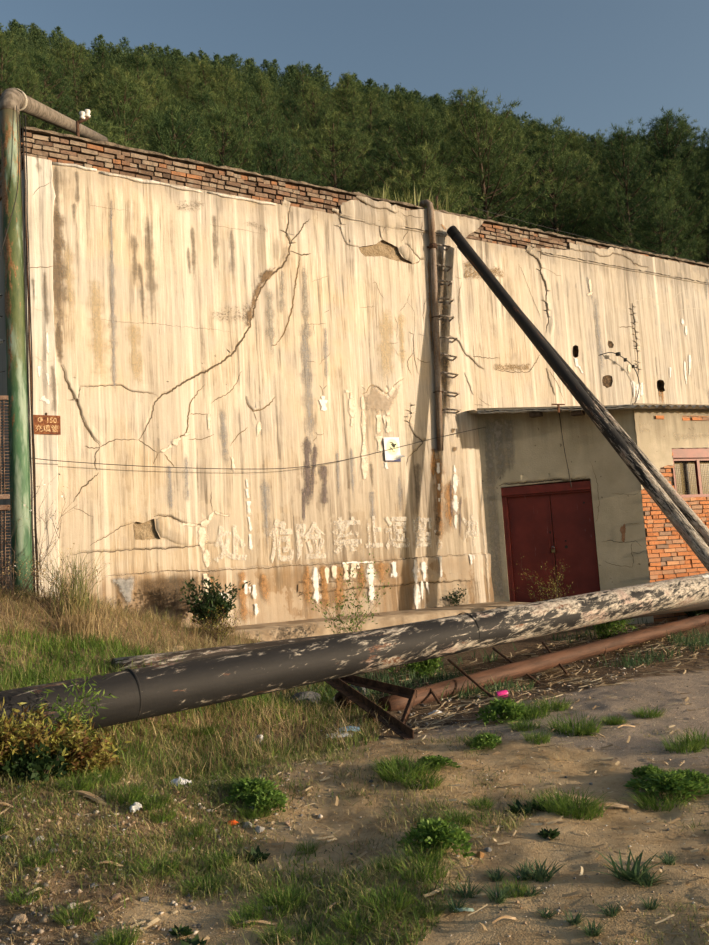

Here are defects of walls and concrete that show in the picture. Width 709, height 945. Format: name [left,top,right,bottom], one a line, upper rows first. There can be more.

water stain [33,168,79,407]
spalling [359,240,412,264]
crack [521,245,560,332]
crack [569,243,649,268]
crack [450,277,563,406]
crack [620,303,642,382]
crack [32,192,490,597]
water stain [302,272,339,519]
spalling [134,519,172,549]
water stain [113,511,228,611]
water stain [313,561,374,603]
water stain [413,560,429,609]